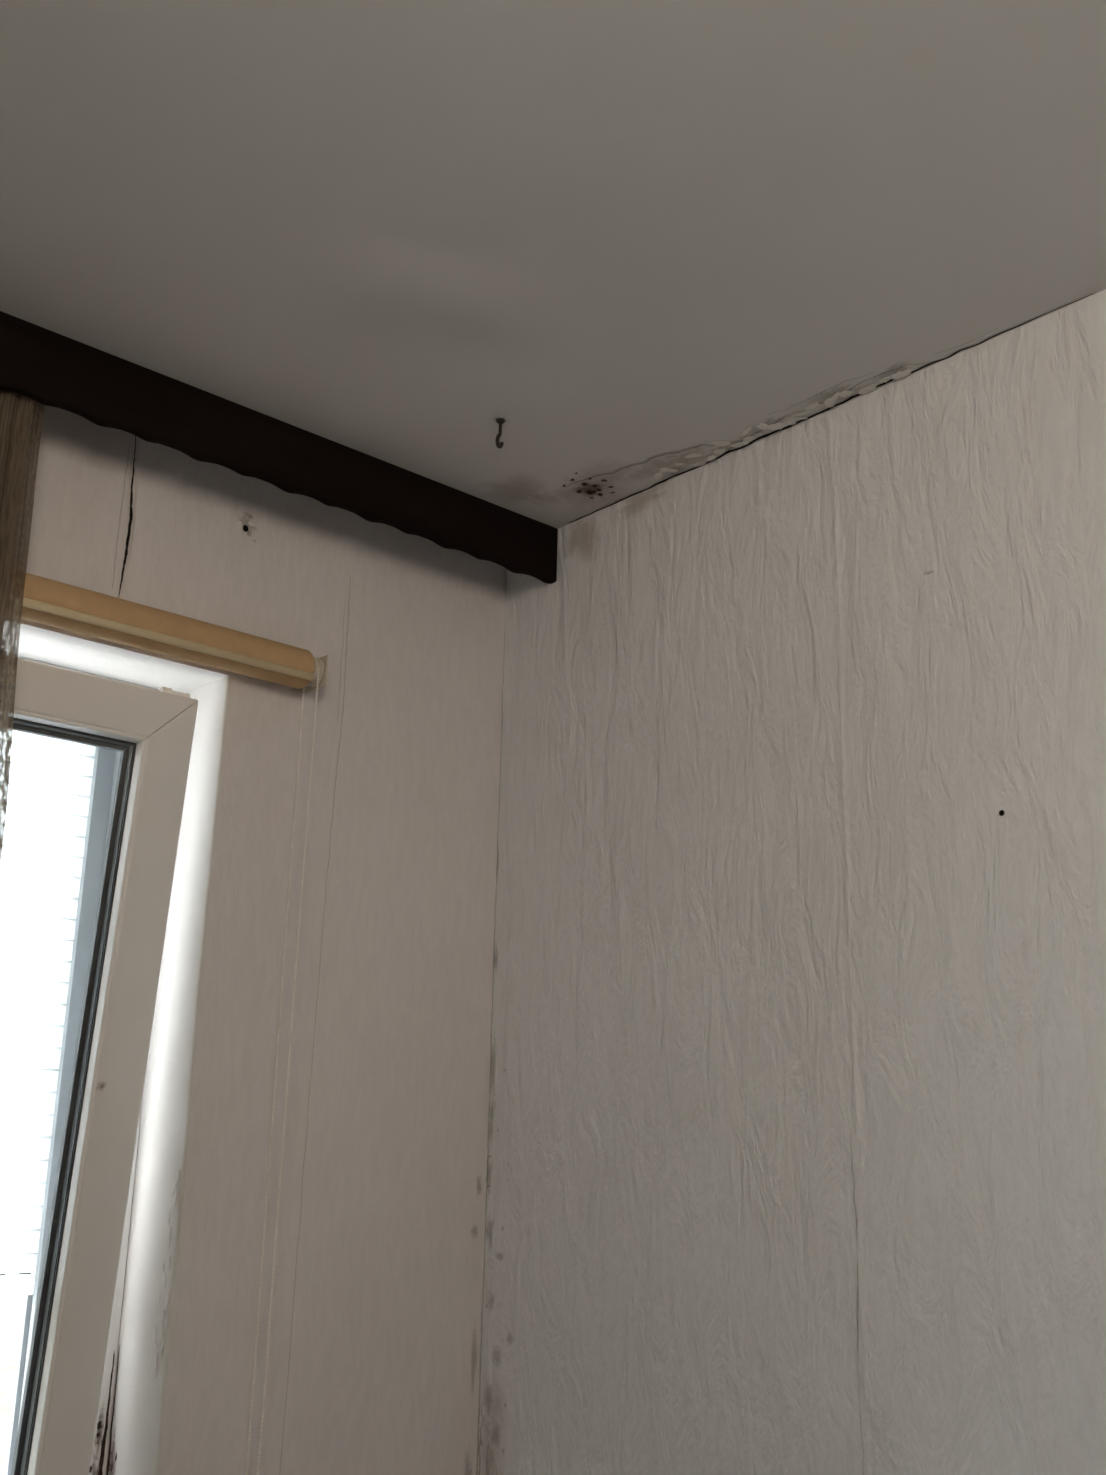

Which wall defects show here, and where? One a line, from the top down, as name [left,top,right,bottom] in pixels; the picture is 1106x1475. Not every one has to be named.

crack [118,436,142,598]
leakage [563,472,615,499]
leakage [89,1346,120,1475]